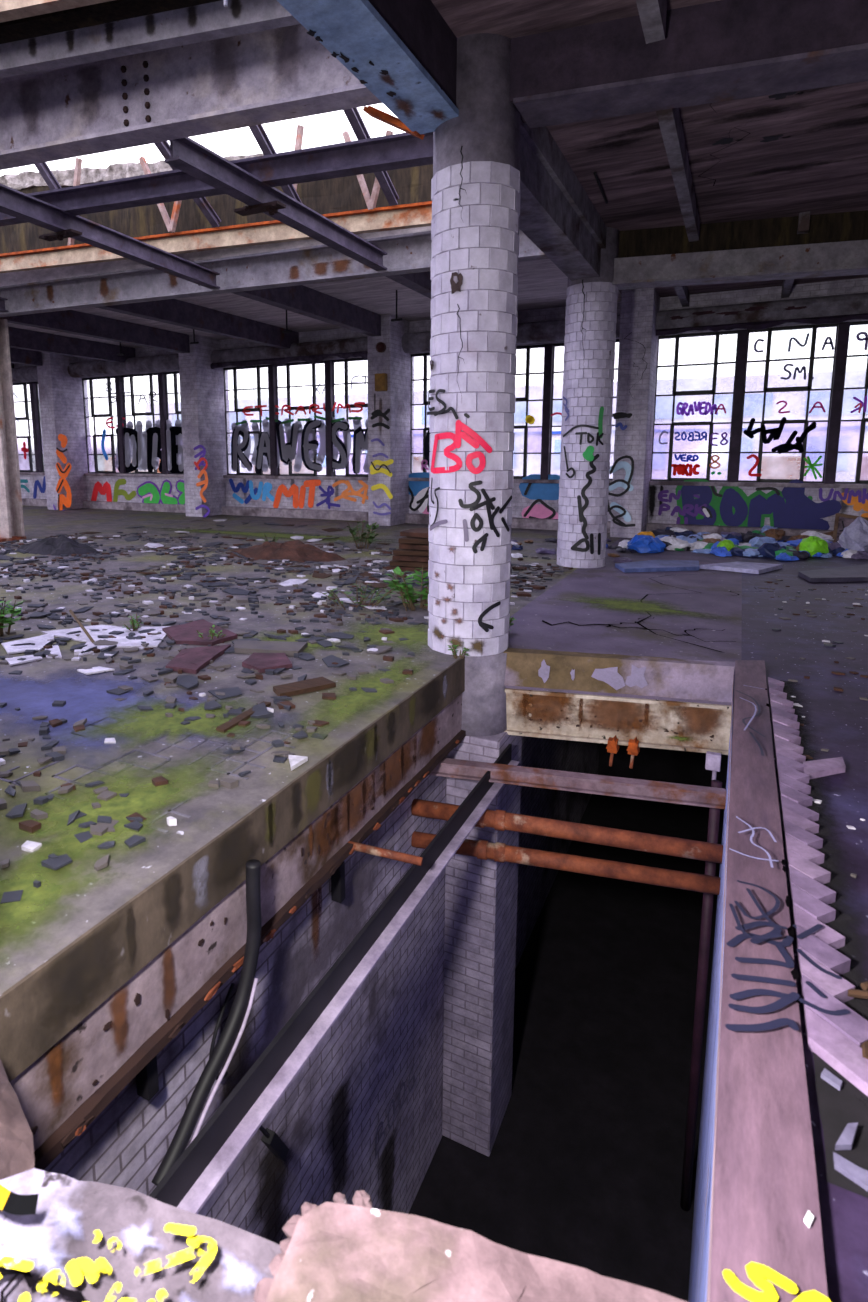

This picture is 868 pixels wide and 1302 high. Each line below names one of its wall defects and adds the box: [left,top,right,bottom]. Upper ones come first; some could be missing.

rust [322,201,432,218]
rust [134,220,282,241]
crack [542,569,760,653]
peeling [538,660,550,683]
peeling [591,665,648,690]
rust [522,694,652,731]
rust [674,706,723,736]
rust [162,949,176,1010]
spalling [43,771,446,1196]
spalling [515,673,735,1302]
spalling [198,868,445,1302]
crack [0,1263,89,1302]